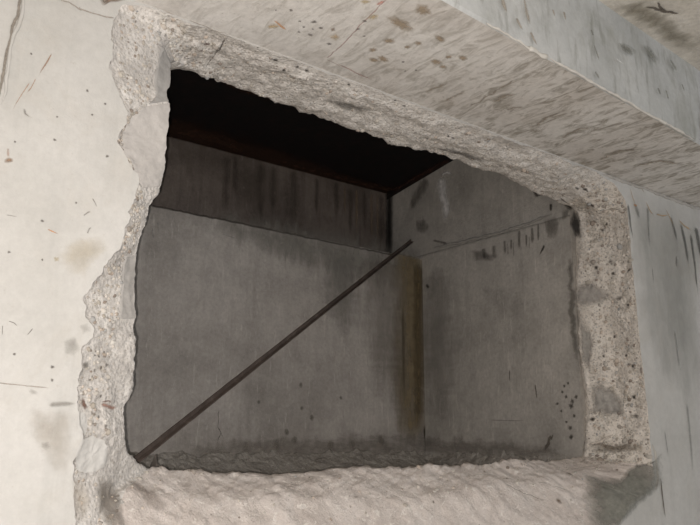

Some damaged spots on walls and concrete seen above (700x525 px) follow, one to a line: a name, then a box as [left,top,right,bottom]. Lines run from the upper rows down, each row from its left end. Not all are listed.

crack [0,0,25,105]
spalling [73,243,660,525]
damp [204,193,549,455]
spalling [109,4,654,468]